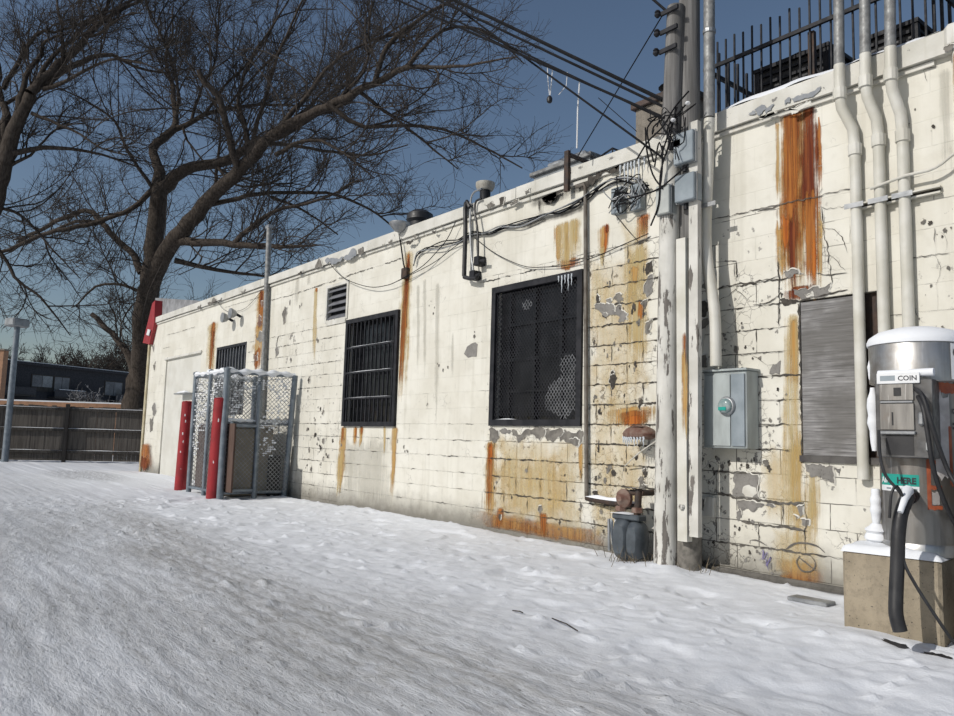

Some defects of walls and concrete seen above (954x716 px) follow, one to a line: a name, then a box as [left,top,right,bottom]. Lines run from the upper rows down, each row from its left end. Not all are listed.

peeling [748,86,821,120]
rust [600,224,609,265]
rust [775,107,823,300]
rust [399,253,412,382]
peeling [594,259,654,335]
crack [705,189,850,559]
rust [337,427,363,490]
rust [484,442,503,527]
spalling [592,455,648,495]
peeling [702,440,776,546]
rust [784,316,816,542]
peeling [805,462,840,485]